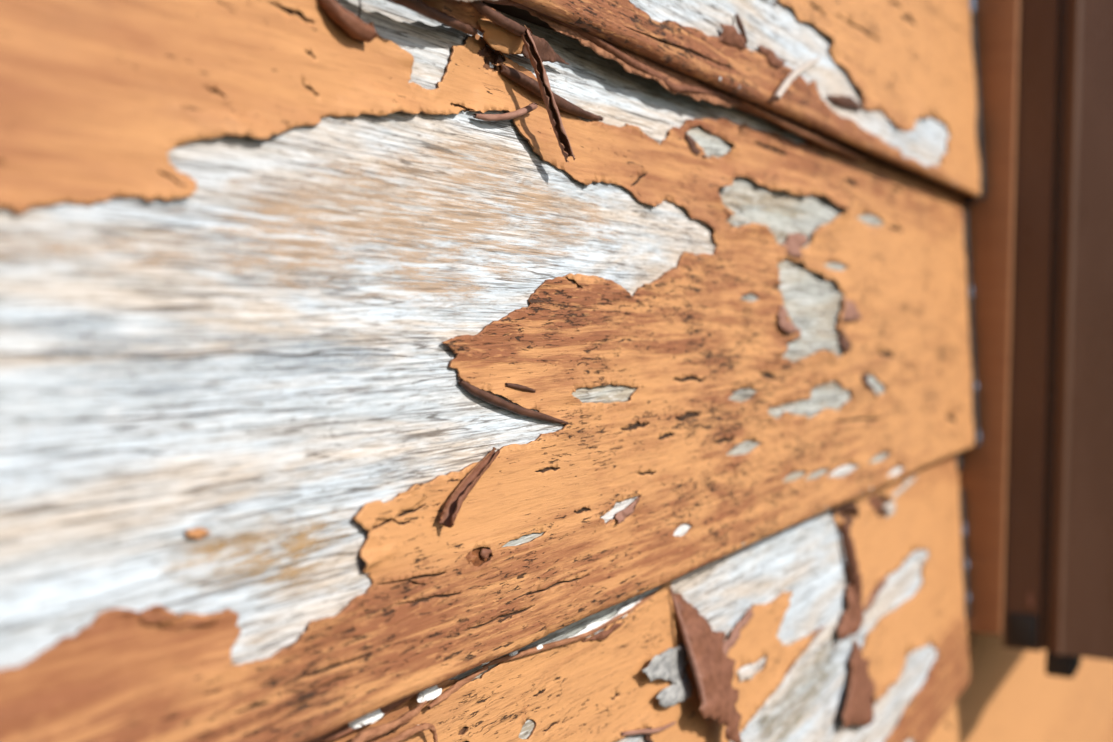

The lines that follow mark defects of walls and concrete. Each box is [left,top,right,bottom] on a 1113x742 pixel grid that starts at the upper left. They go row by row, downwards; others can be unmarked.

peeling [629,0,949,167]
peeling [0,0,807,669]
peeling [716,176,862,362]
peeling [768,381,851,418]
peeling [783,452,890,482]
peeling [855,214,885,226]
peeling [861,374,885,399]
peeling [449,466,937,742]